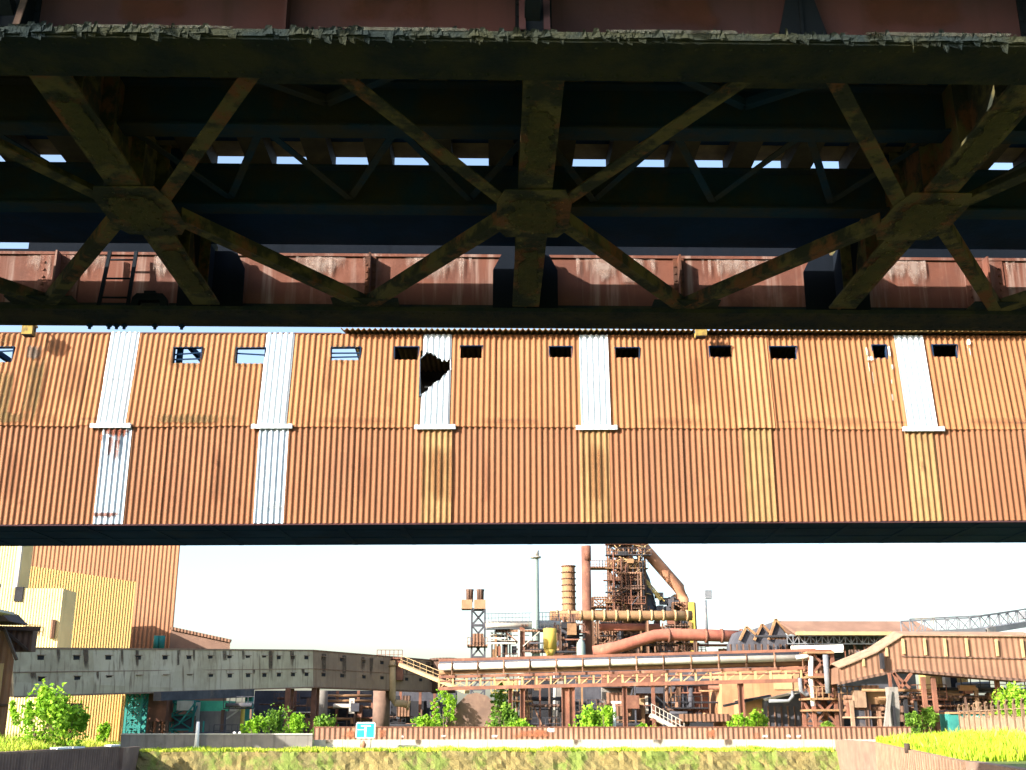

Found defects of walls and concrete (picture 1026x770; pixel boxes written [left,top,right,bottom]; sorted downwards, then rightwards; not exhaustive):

leakage [0,346,44,422]